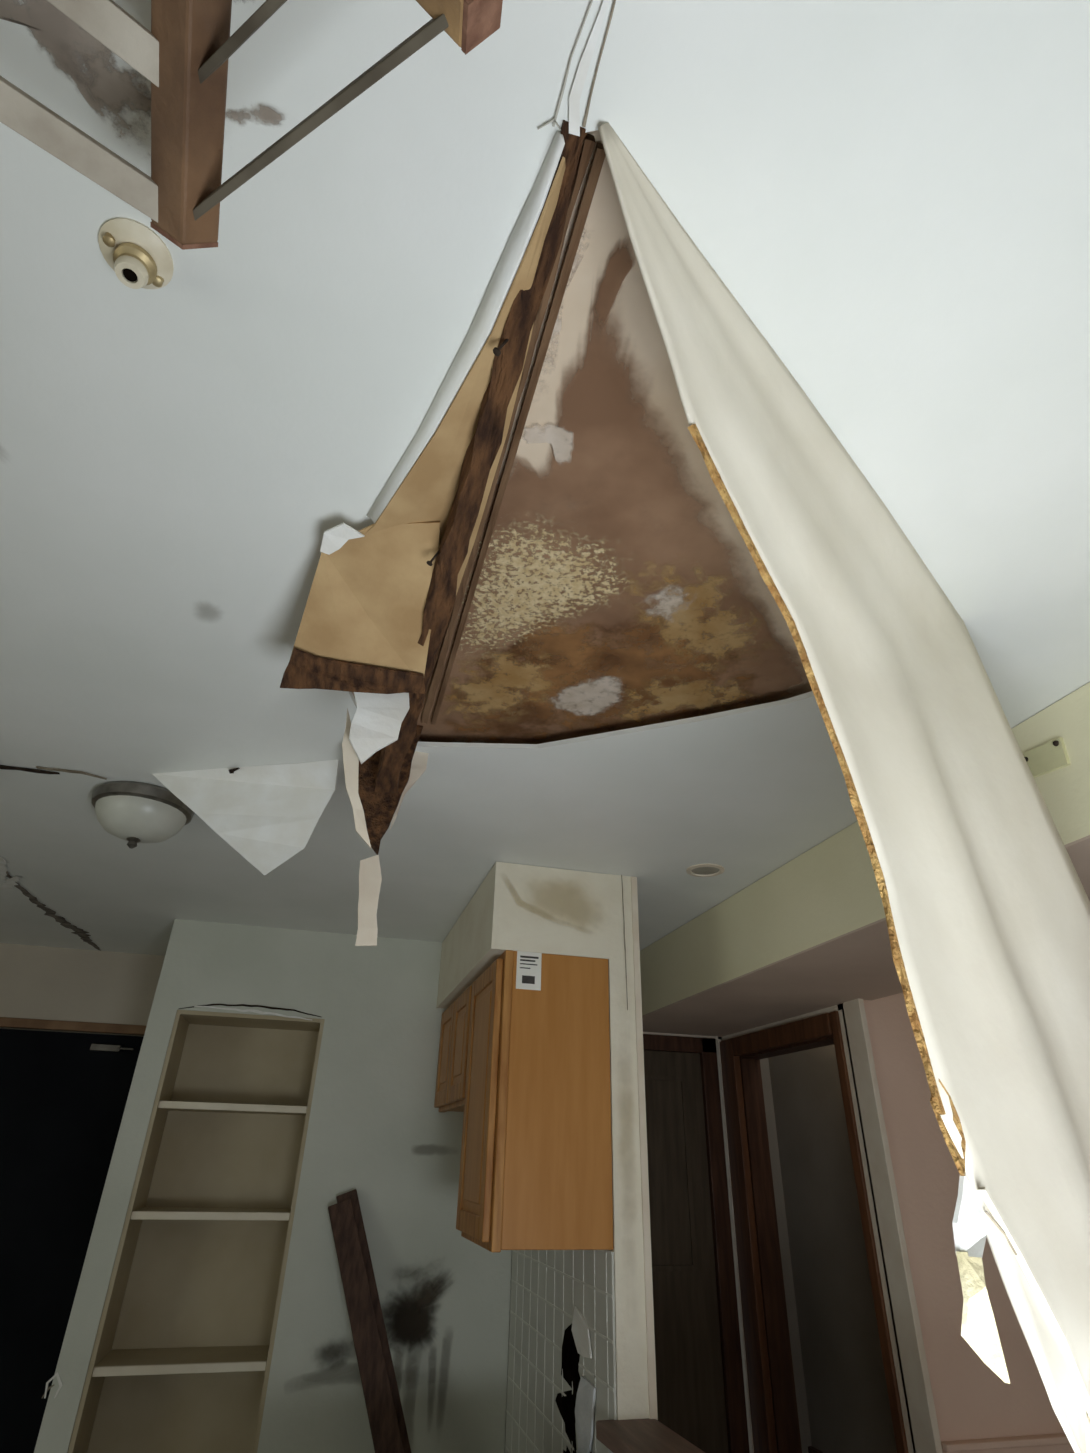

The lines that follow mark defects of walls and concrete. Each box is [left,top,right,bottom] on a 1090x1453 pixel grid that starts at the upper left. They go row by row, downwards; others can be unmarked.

leakage [0,0,151,137]
leakage [226,105,282,125]
crack [538,0,616,136]
leakage [280,244,806,744]
crack [0,765,107,780]
crack [0,857,101,951]
peeling [930,1079,1010,1383]
leakage [382,1279,444,1345]
spalling [555,1306,596,1453]